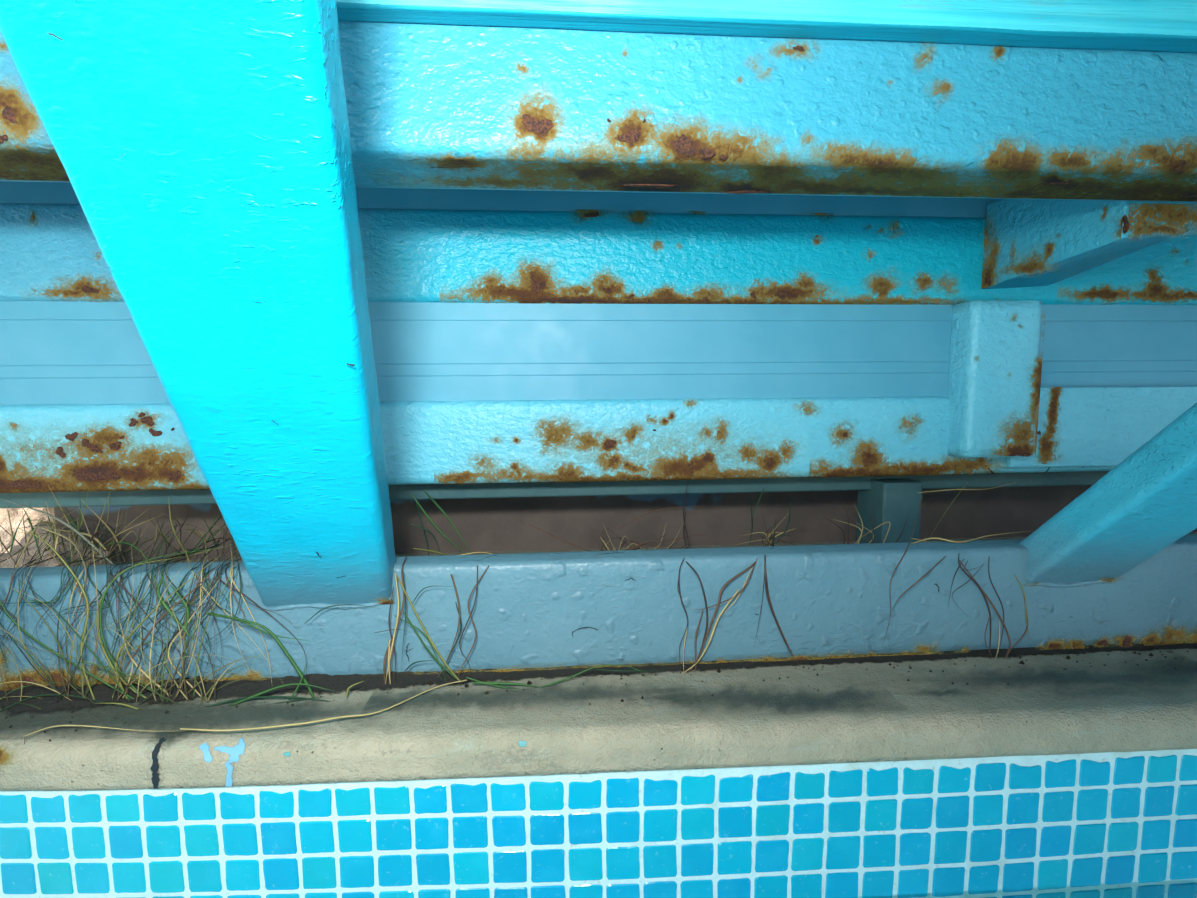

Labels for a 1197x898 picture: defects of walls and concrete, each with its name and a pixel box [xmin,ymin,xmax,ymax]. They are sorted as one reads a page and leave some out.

corrosion [0,86,70,181]
corrosion [404,92,1197,238]
corrosion [43,277,117,302]
corrosion [439,262,958,305]
corrosion [981,222,1059,289]
corrosion [1065,270,1197,303]
corrosion [0,412,210,493]
corrosion [434,400,795,484]
corrosion [806,356,1062,478]
damp [685,689,864,712]
damp [979,661,1197,684]
crack [150,738,166,789]